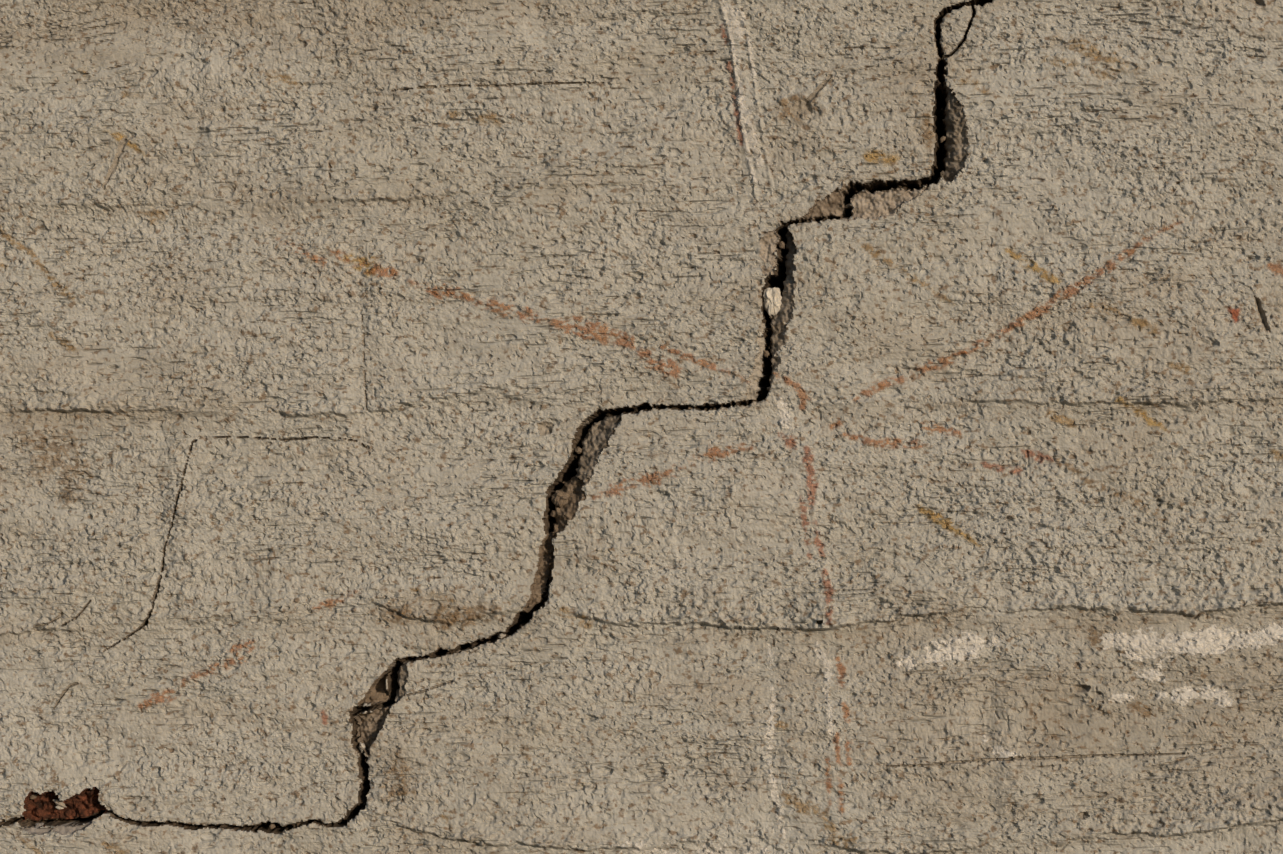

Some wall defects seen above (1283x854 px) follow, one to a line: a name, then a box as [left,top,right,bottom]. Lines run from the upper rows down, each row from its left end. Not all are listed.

crack [103,0,993,834]
crack [34,600,92,628]
crack [0,817,25,827]